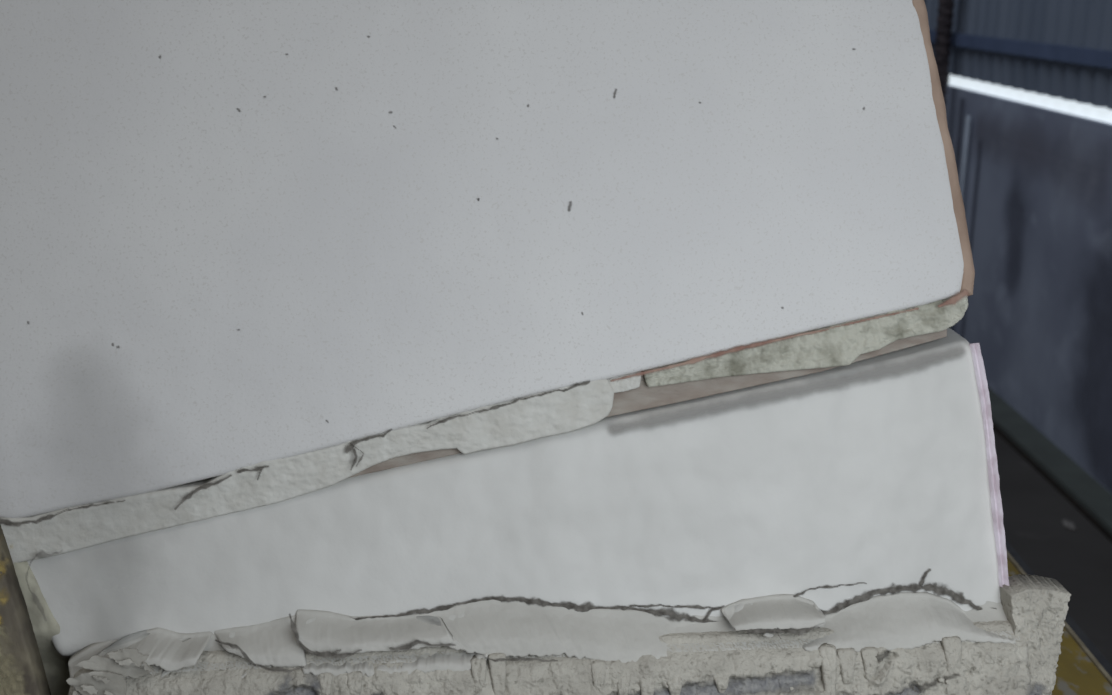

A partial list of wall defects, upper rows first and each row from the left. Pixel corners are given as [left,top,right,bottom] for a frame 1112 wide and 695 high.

crack [427,381,590,429]
crack [345,429,392,470]
crack [175,466,269,510]
crack [0,500,125,526]
crack [353,569,996,650]
crack [215,614,361,672]
peeling [66,648,154,695]
spalling [269,679,320,695]
spalling [637,672,815,695]
spalling [889,674,959,695]